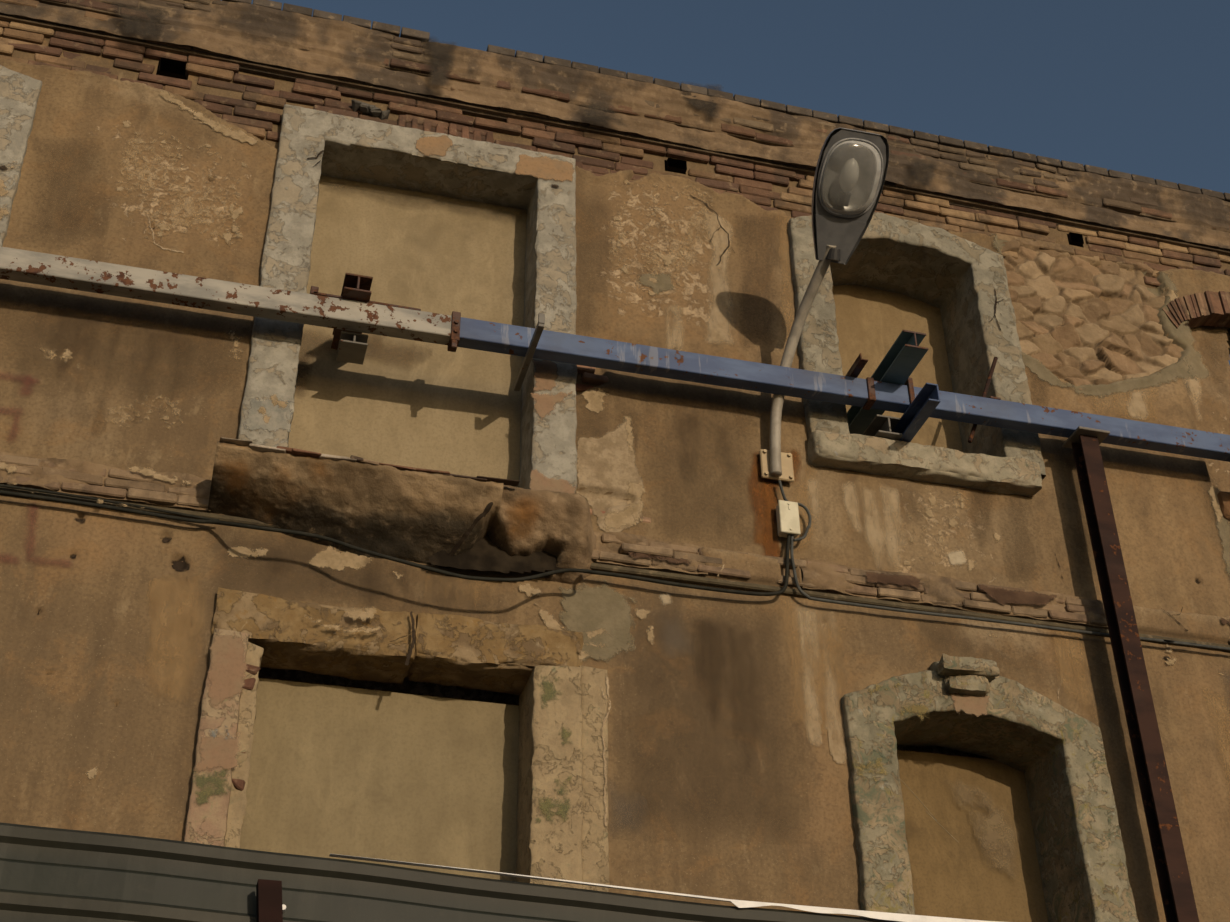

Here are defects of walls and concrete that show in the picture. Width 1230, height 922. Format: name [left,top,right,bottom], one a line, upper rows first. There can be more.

spalling [0,21,814,220]
peeling [117,120,243,244]
crack [690,195,735,266]
spalling [875,189,1230,390]
peeling [531,360,609,423]
peeling [227,546,269,558]
peeling [309,529,373,571]
spalling [530,416,751,580]
corrosion [750,454,780,557]
corrosion [791,451,799,479]
leakage [787,606,846,764]